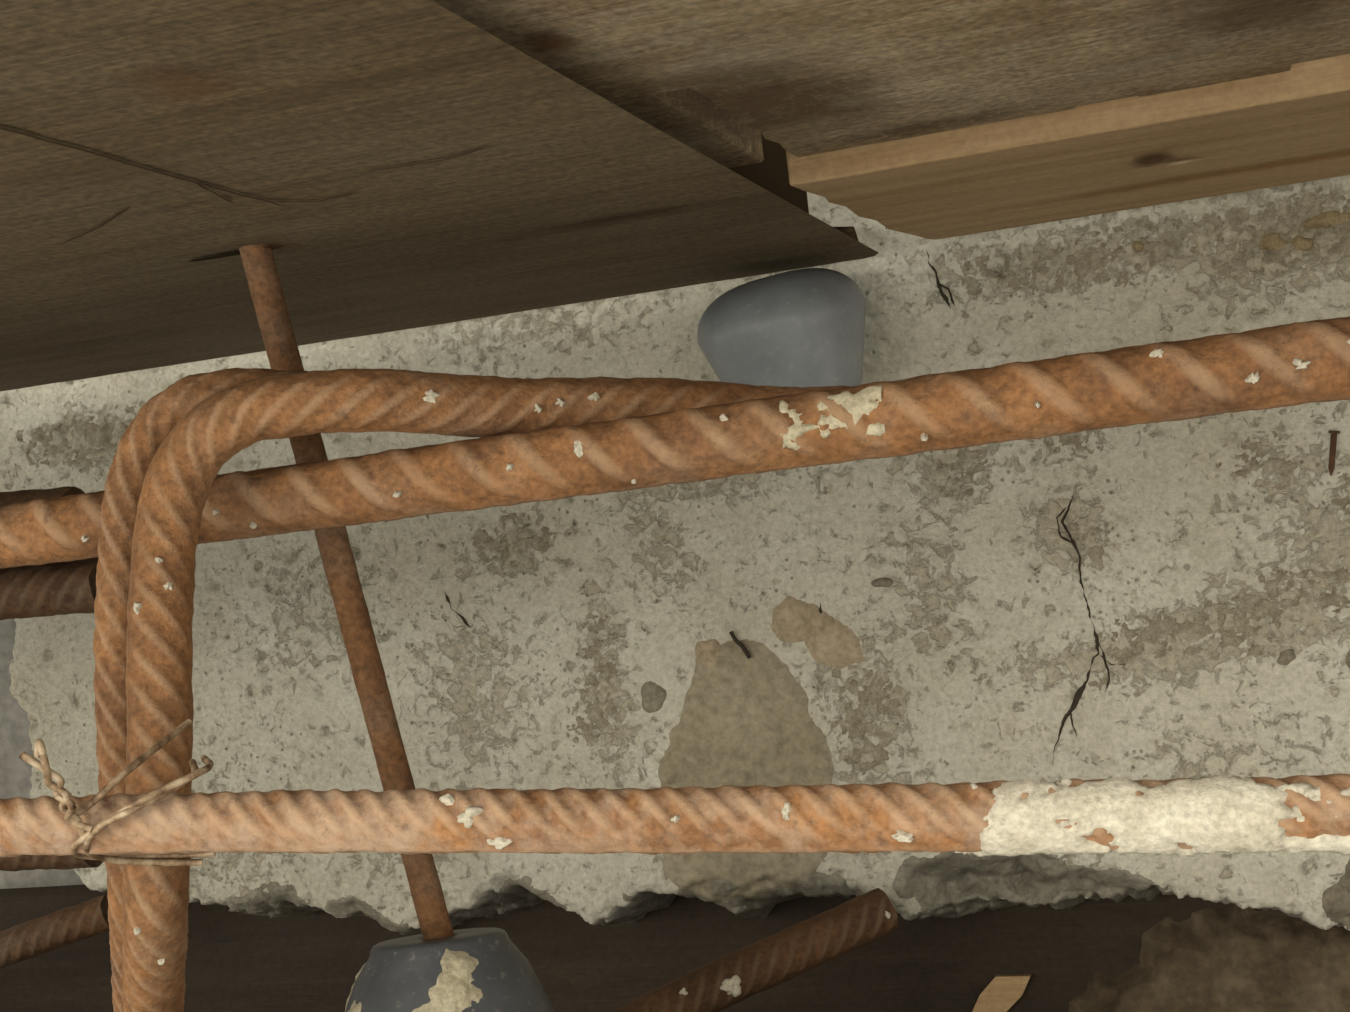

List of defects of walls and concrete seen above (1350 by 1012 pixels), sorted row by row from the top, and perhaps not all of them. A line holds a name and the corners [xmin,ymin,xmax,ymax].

crack [1052,487,1122,765]
peeling [658,596,867,788]
spalling [193,881,422,935]
spalling [499,875,571,912]
peeling [623,852,865,918]
spalling [893,852,1171,918]
spalling [1322,859,1350,930]